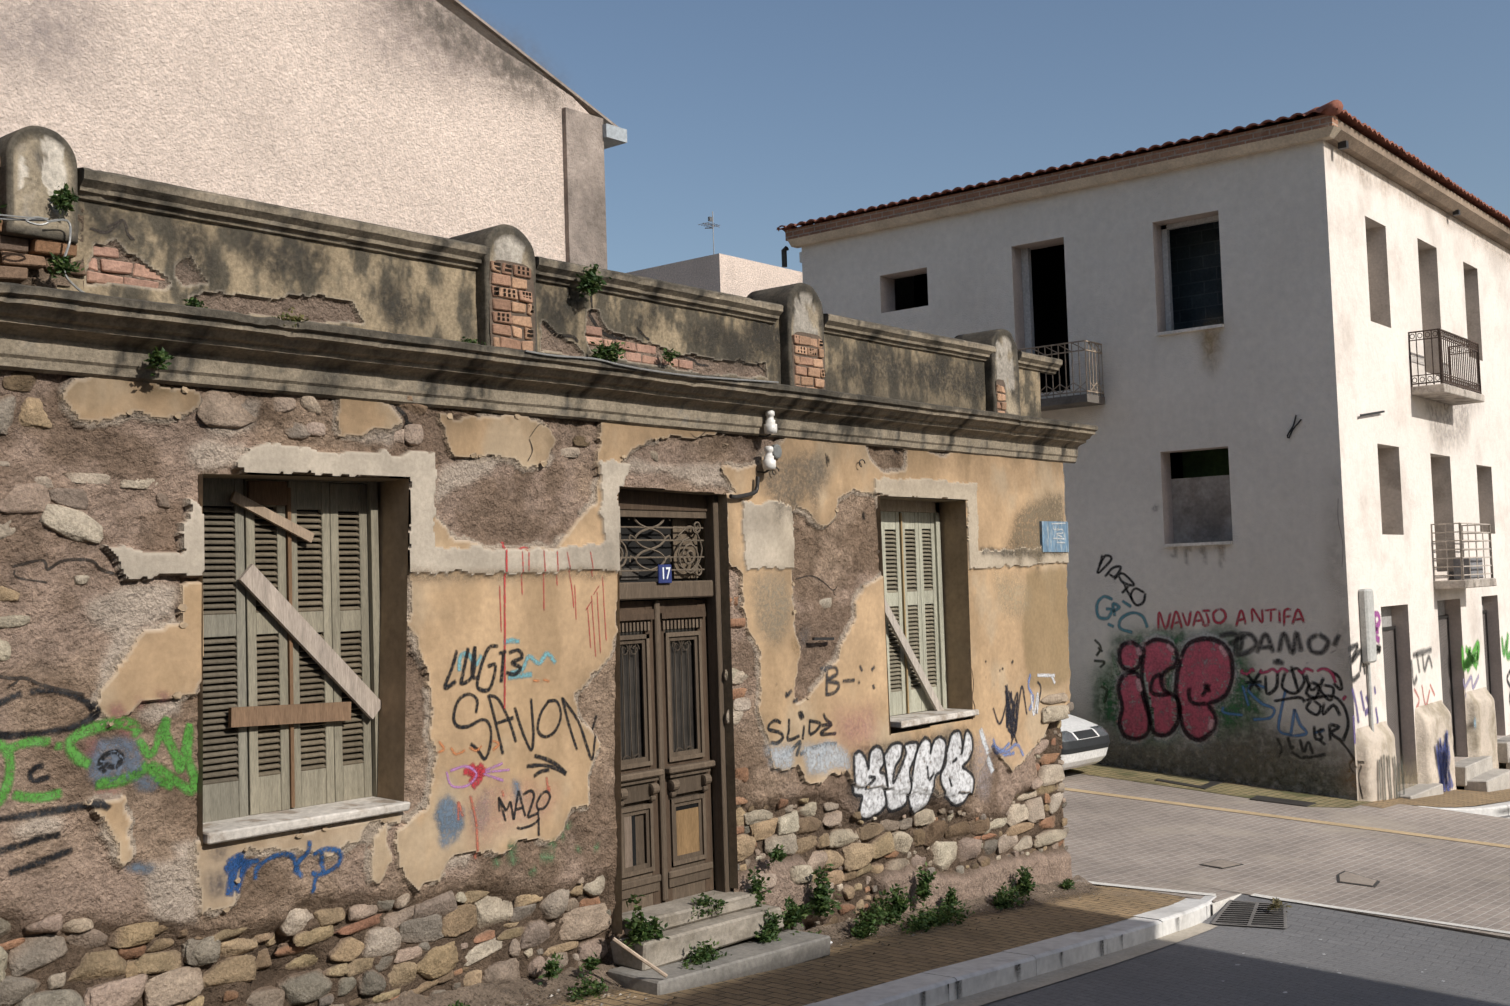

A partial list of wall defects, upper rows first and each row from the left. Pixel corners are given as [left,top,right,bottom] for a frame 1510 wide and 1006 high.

flaking render [489,260,536,351]
flaking render [585,309,768,377]
water stain [841,347,985,396]
flaking render [866,446,908,472]
flaking render [791,489,882,703]
flaking render [0,369,783,939]
flaking render [728,544,1041,819]
flaking render [734,854,830,923]
flaking render [875,849,1072,919]